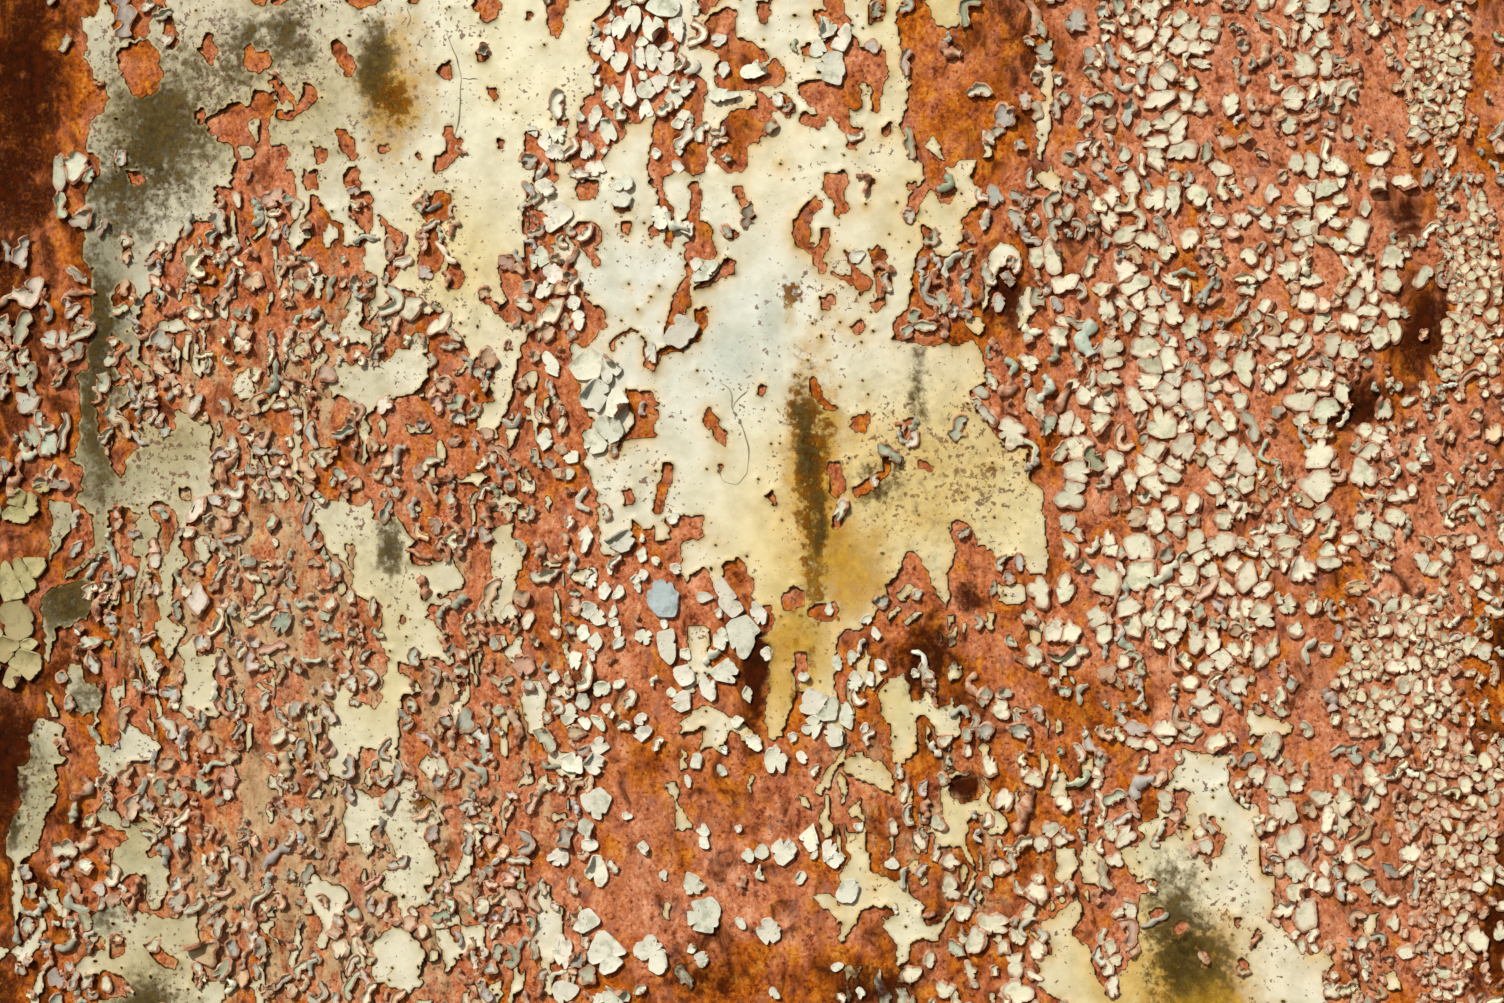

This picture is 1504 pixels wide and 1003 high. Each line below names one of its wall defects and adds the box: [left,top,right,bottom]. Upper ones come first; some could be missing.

rust [0,0,61,214]
peeling [0,0,795,1003]
peeling [604,0,1504,1003]
rust [889,613,962,688]
rust [956,582,982,611]
rust [0,696,38,822]
rust [948,777,978,801]
rust [664,950,735,995]
rust [843,964,913,1003]
rust [1460,878,1504,989]